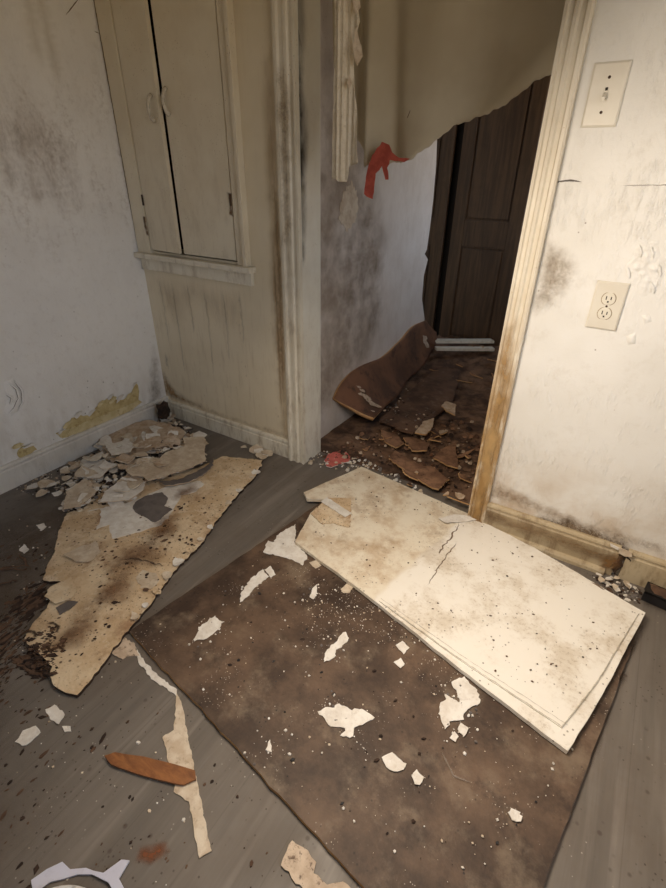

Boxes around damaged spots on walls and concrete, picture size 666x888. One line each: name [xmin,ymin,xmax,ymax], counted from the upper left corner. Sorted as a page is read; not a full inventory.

peeling [56,382,141,438]
peeling [12,443,37,458]
leakage [542,513,628,558]